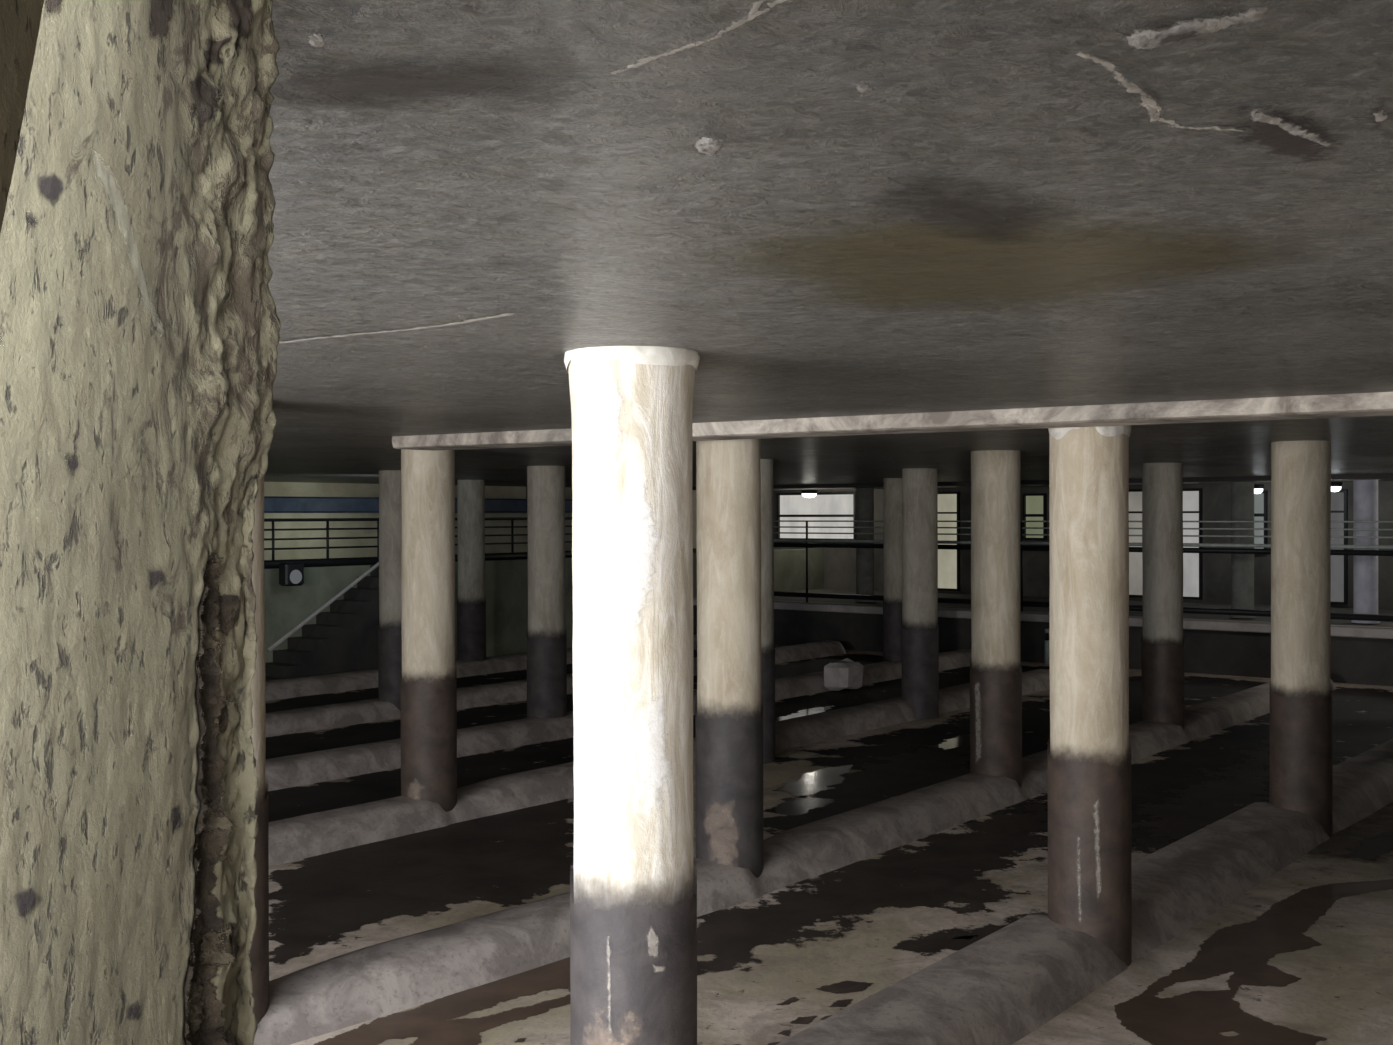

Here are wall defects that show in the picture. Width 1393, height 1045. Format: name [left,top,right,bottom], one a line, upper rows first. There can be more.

spalling [1126,8,1267,49]
crack [1076,52,1244,132]
spalling [1235,106,1340,164]
spalling [171,553,240,1045]
water stain [250,600,1393,1045]